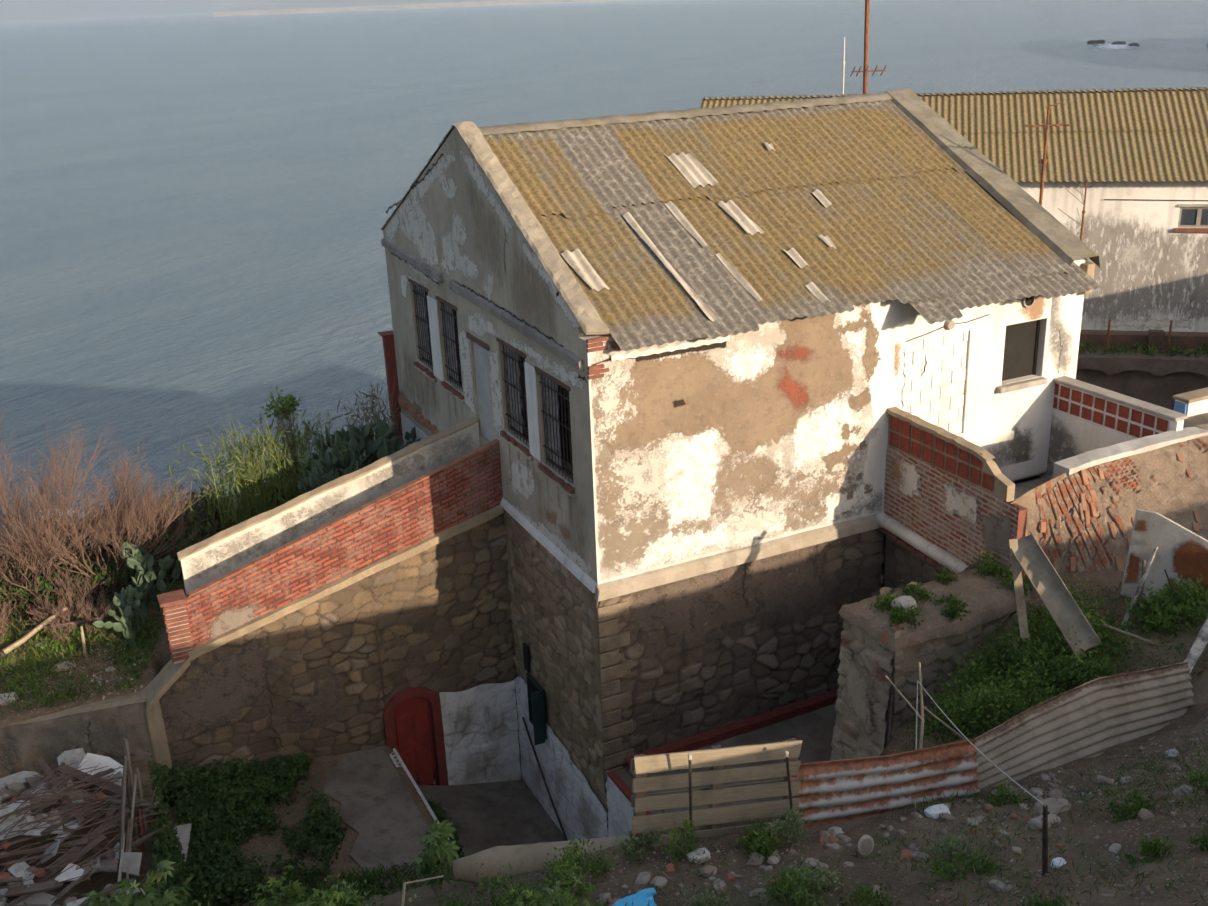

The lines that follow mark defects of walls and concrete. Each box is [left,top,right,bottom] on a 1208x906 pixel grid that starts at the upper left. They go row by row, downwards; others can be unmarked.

leakage [1070,218,1208,321]
spalling [386,150,881,577]
leakage [1022,295,1069,370]